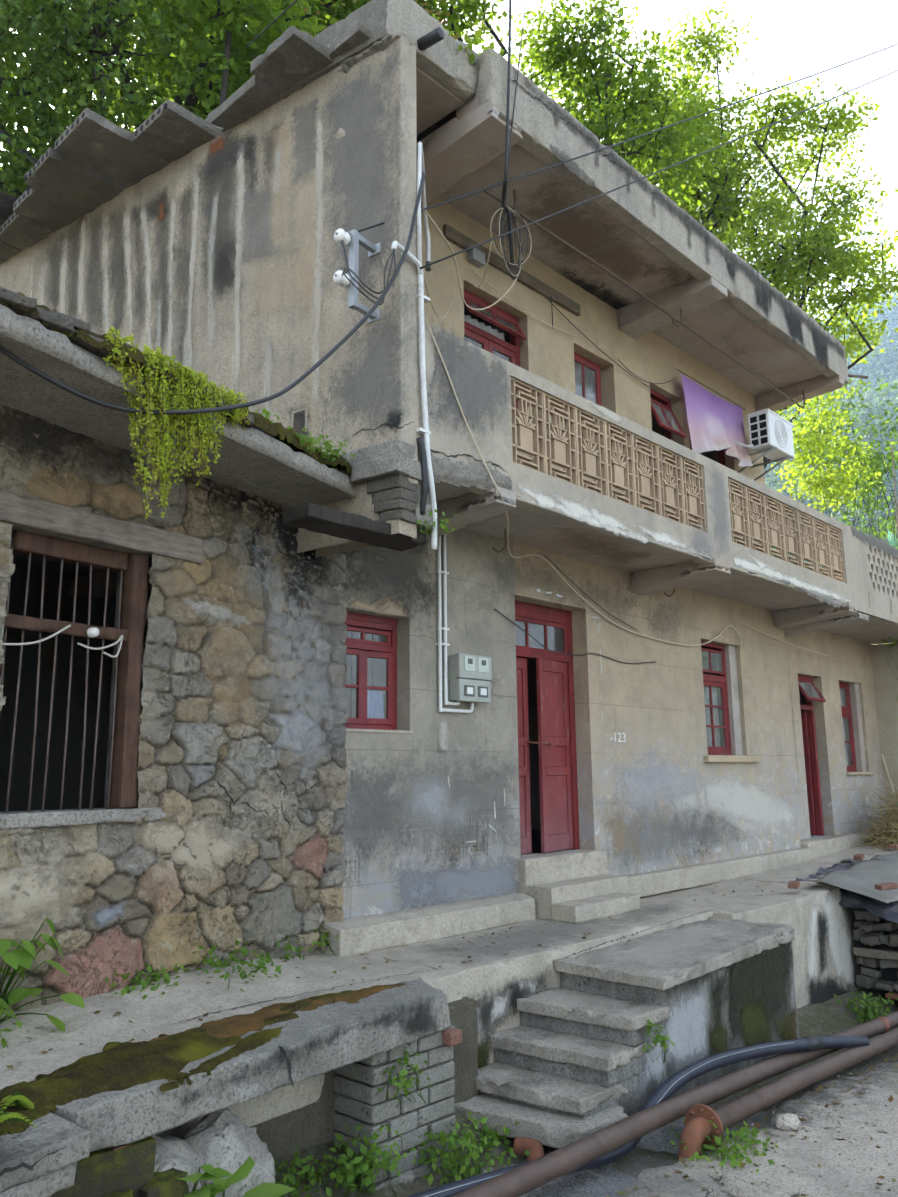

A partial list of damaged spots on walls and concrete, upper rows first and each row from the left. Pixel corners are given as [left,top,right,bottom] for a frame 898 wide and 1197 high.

damp [29,268,44,305]
damp [60,219,86,314]
damp [124,123,282,385]
damp [290,55,413,438]
damp [429,327,508,430]
crack [353,422,411,436]
crack [430,449,505,472]
spalling [182,597,251,626]
damp [225,1003,437,1083]
crack [705,1174,725,1197]